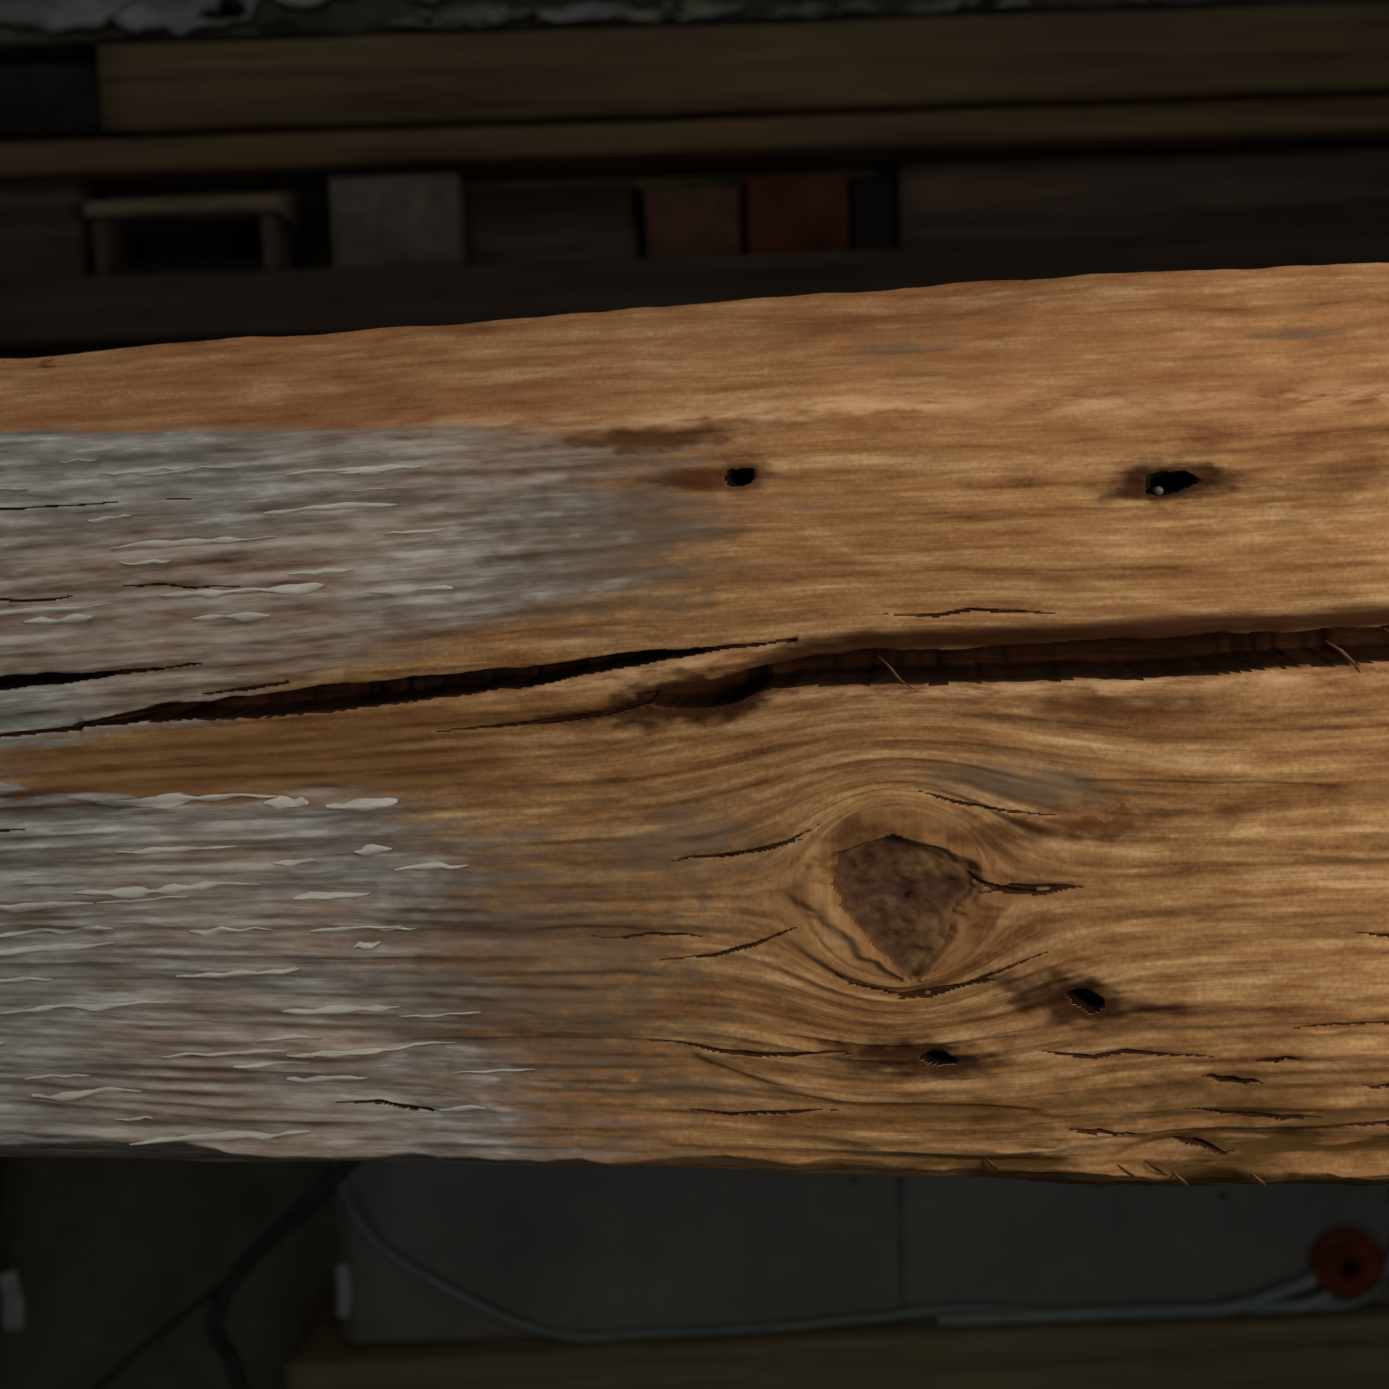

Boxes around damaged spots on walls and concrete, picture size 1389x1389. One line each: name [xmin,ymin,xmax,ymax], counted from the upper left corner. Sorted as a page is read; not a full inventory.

peeling [0,0,260,36]
peeling [278,0,328,8]
peeling [384,0,876,27]
peeling [897,0,1032,14]
crack [0,608,1389,738]